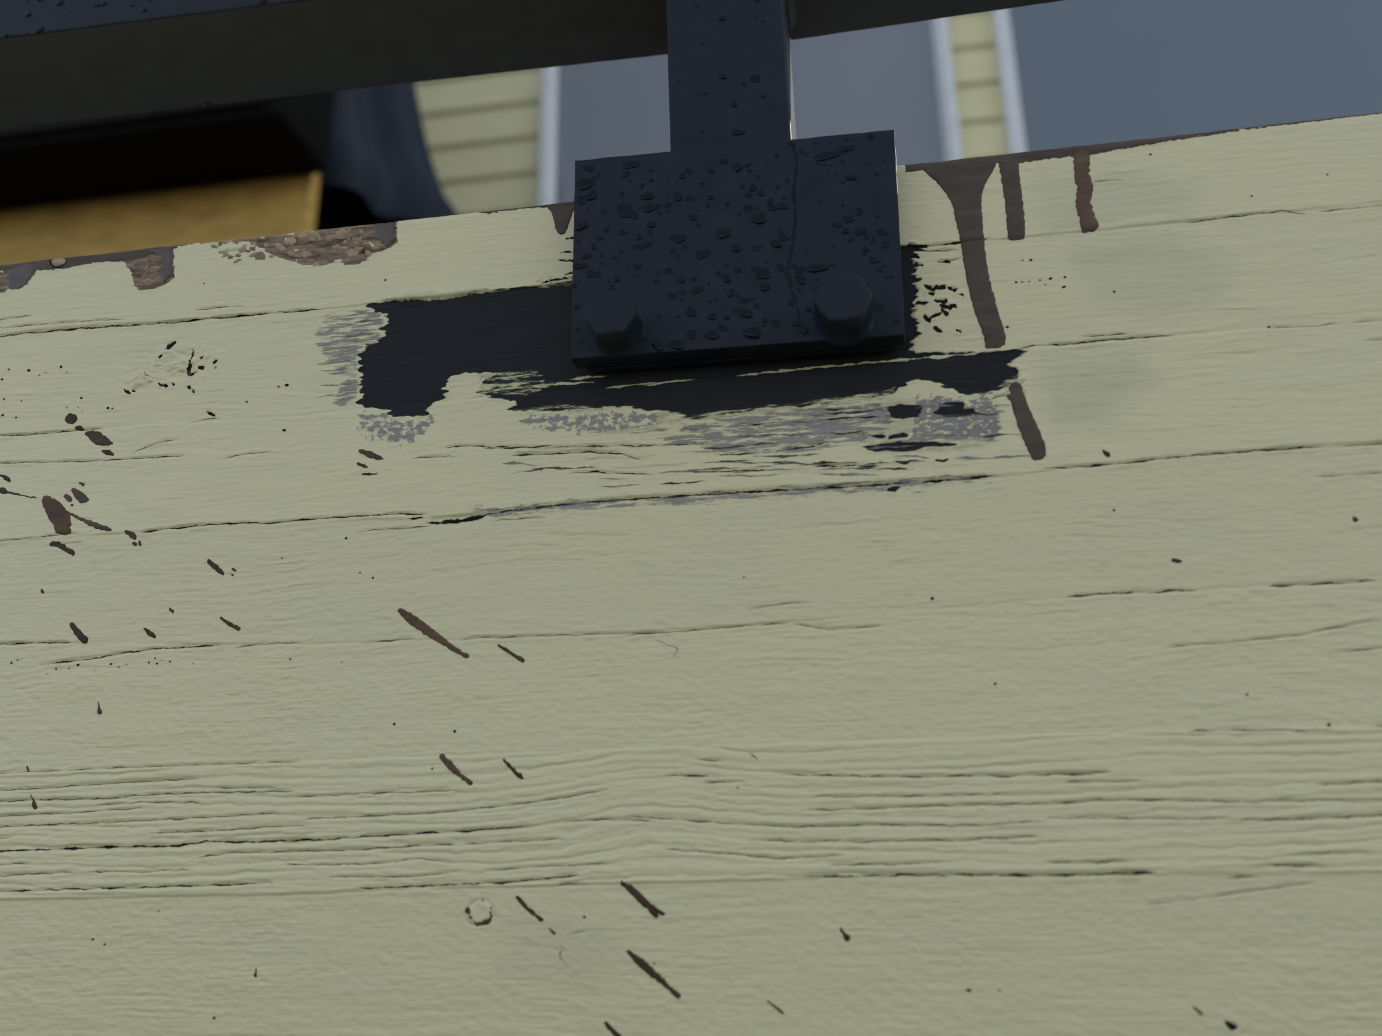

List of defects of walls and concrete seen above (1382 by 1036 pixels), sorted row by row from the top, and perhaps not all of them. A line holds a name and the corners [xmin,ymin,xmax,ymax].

peeling [200,221,398,266]
peeling [0,258,67,293]
peeling [124,246,175,290]
peeling [315,237,1031,517]